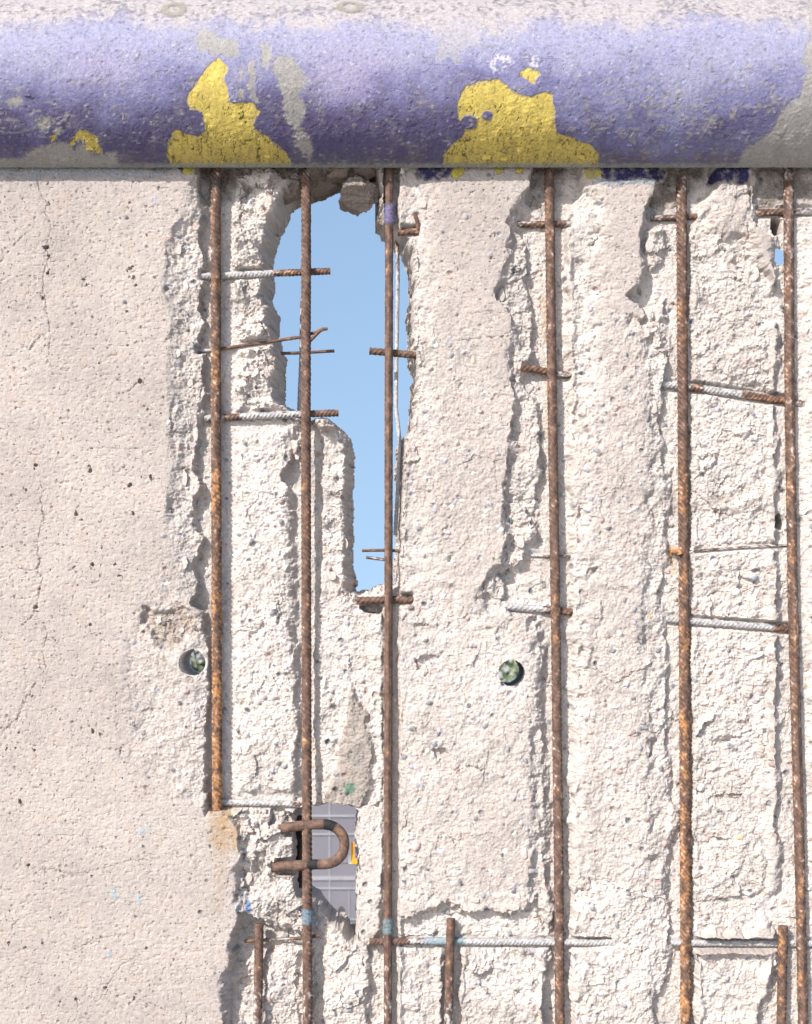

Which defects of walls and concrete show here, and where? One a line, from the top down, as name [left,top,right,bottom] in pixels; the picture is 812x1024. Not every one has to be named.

peeling [5,95,24,107]
peeling [0,114,121,168]
spalling [124,28,314,1024]
spalling [311,0,812,1024]